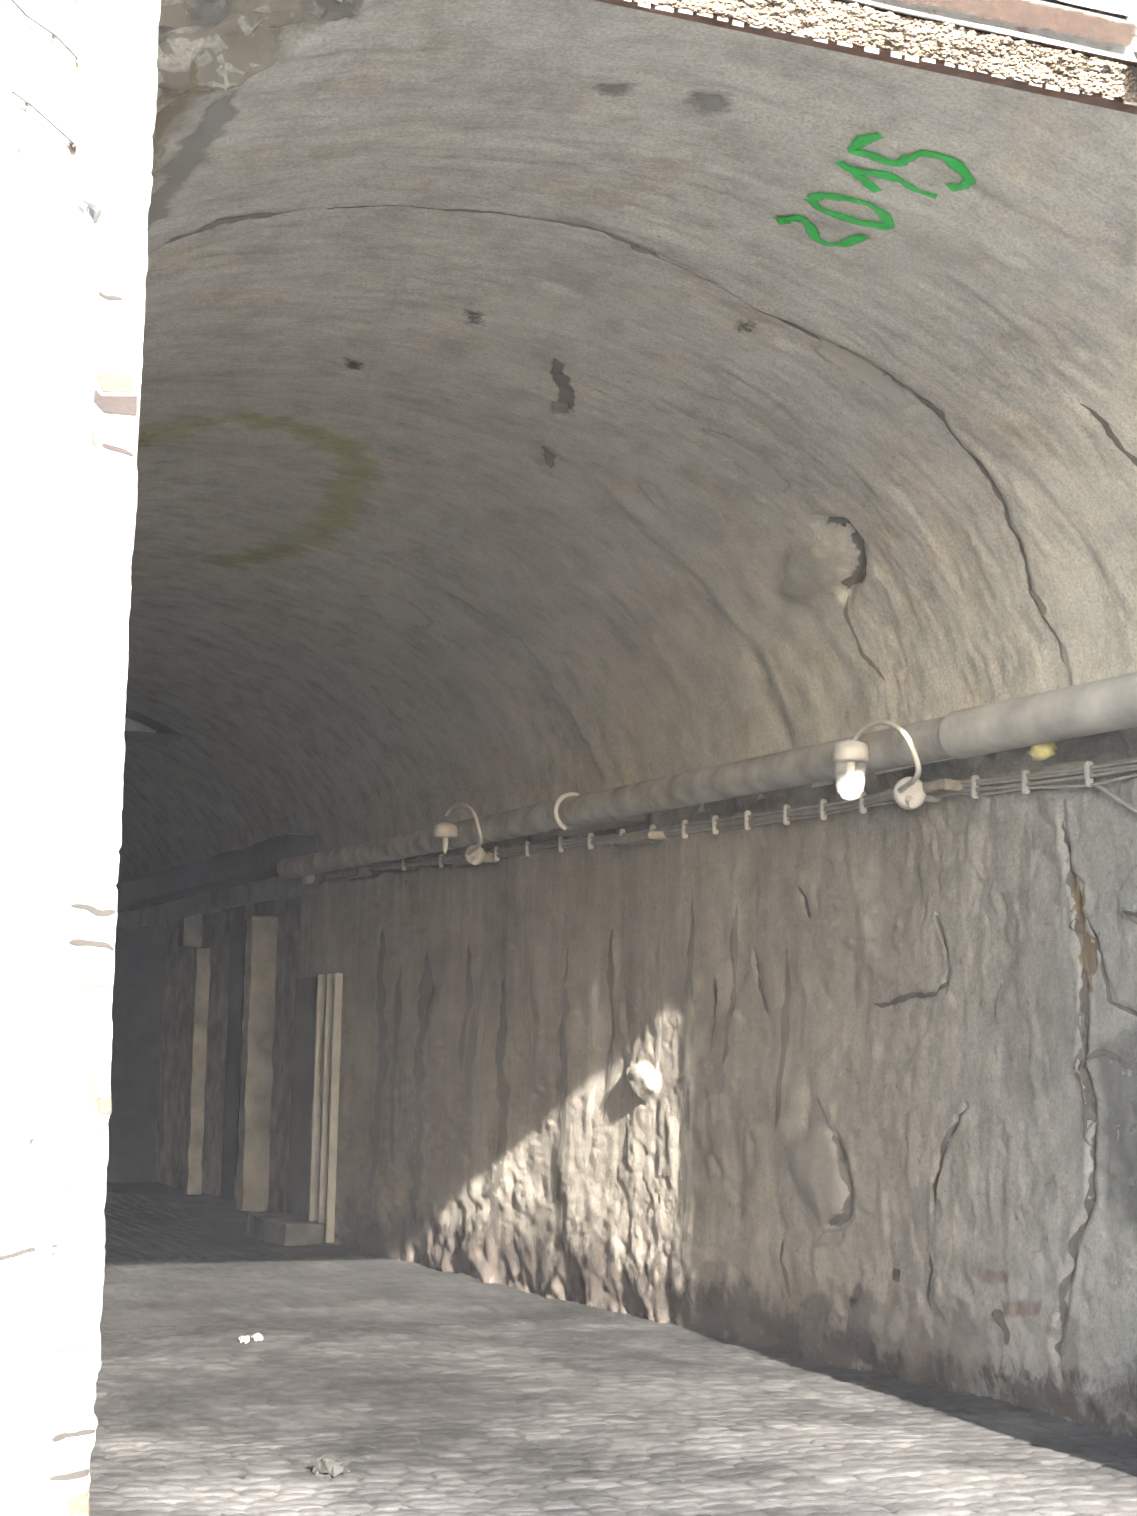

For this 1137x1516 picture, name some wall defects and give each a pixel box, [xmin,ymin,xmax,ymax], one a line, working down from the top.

corrosion [899,0,1135,47]
water stain [147,66,233,226]
crack [155,205,1065,663]
crack [1081,404,1137,466]
crack [844,598,885,680]
crack [1055,818,1137,1386]